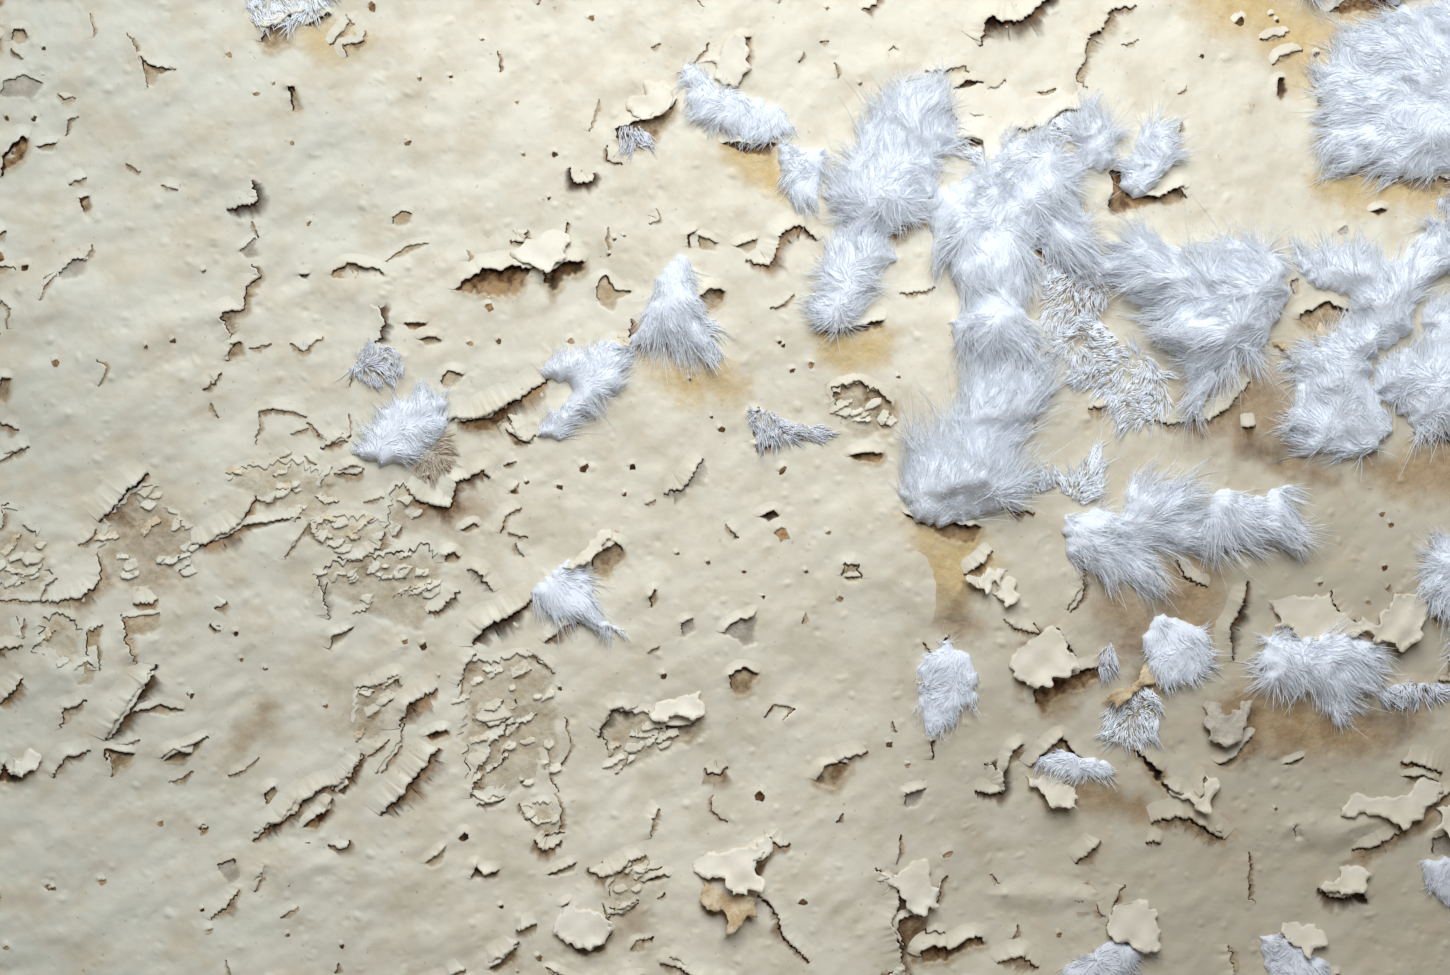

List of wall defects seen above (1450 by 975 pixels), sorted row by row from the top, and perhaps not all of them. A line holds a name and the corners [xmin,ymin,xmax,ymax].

peeling [946,0,1137,162]
damp [1316,173,1450,204]
peeling [442,227,713,365]
damp [822,334,887,366]
damp [1047,257,1096,315]
damp [1191,378,1337,482]
peeling [0,424,674,975]
peeling [692,828,791,936]
peeling [860,845,1044,975]
peeling [974,626,1103,811]
peeling [1125,700,1255,846]
peeling [1316,744,1450,904]